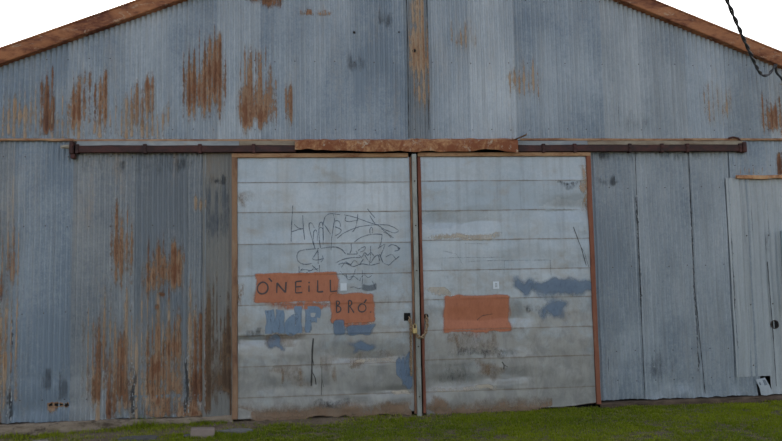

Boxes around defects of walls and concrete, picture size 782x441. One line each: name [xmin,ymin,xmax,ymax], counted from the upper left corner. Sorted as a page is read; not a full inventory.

corrosion [2,66,169,139]
corrosion [183,31,226,119]
corrosion [238,47,293,132]
corrosion [409,0,429,105]
corrosion [87,202,232,421]